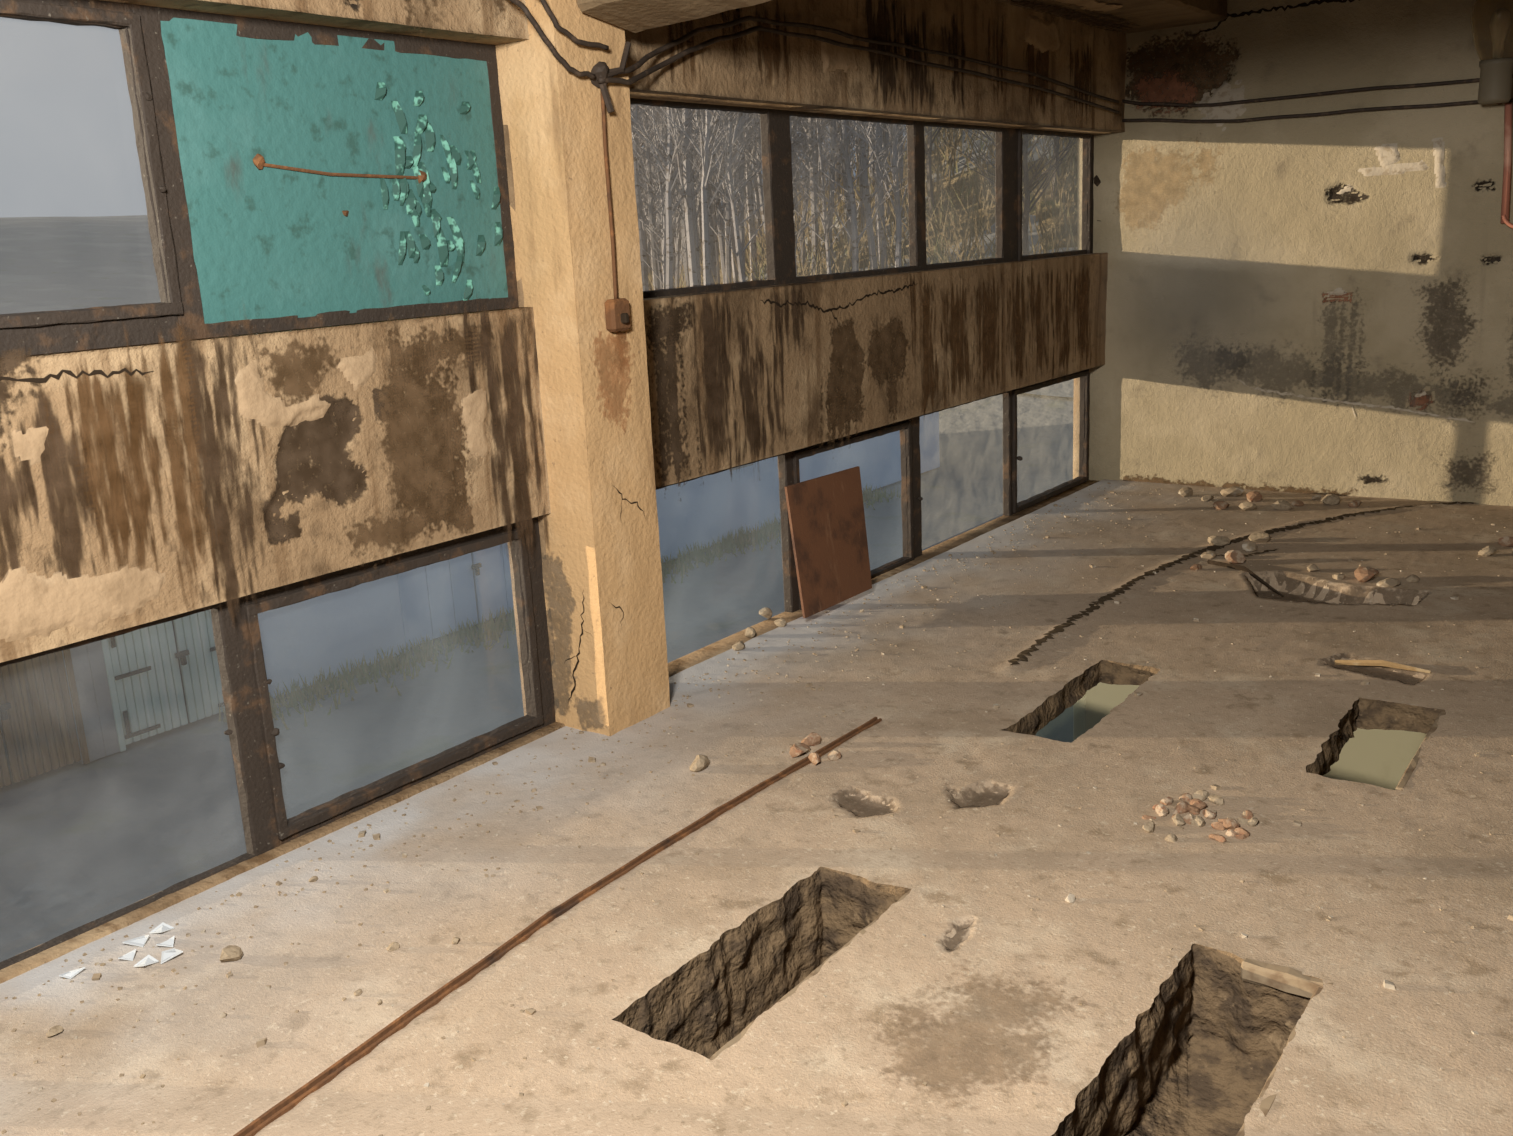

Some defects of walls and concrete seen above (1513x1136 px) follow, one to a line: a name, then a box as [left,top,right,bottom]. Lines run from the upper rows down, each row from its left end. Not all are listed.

flaking render [10,426,49,465]
crack [0,368,154,383]
damp [0,325,258,623]
damp [260,338,340,404]
flaking render [234,348,397,544]
flaking render [461,388,489,458]
damp [646,286,804,499]
damp [820,264,1092,448]
damp [1422,282,1483,404]
damp [1445,454,1494,493]
flaking render [0,564,166,643]